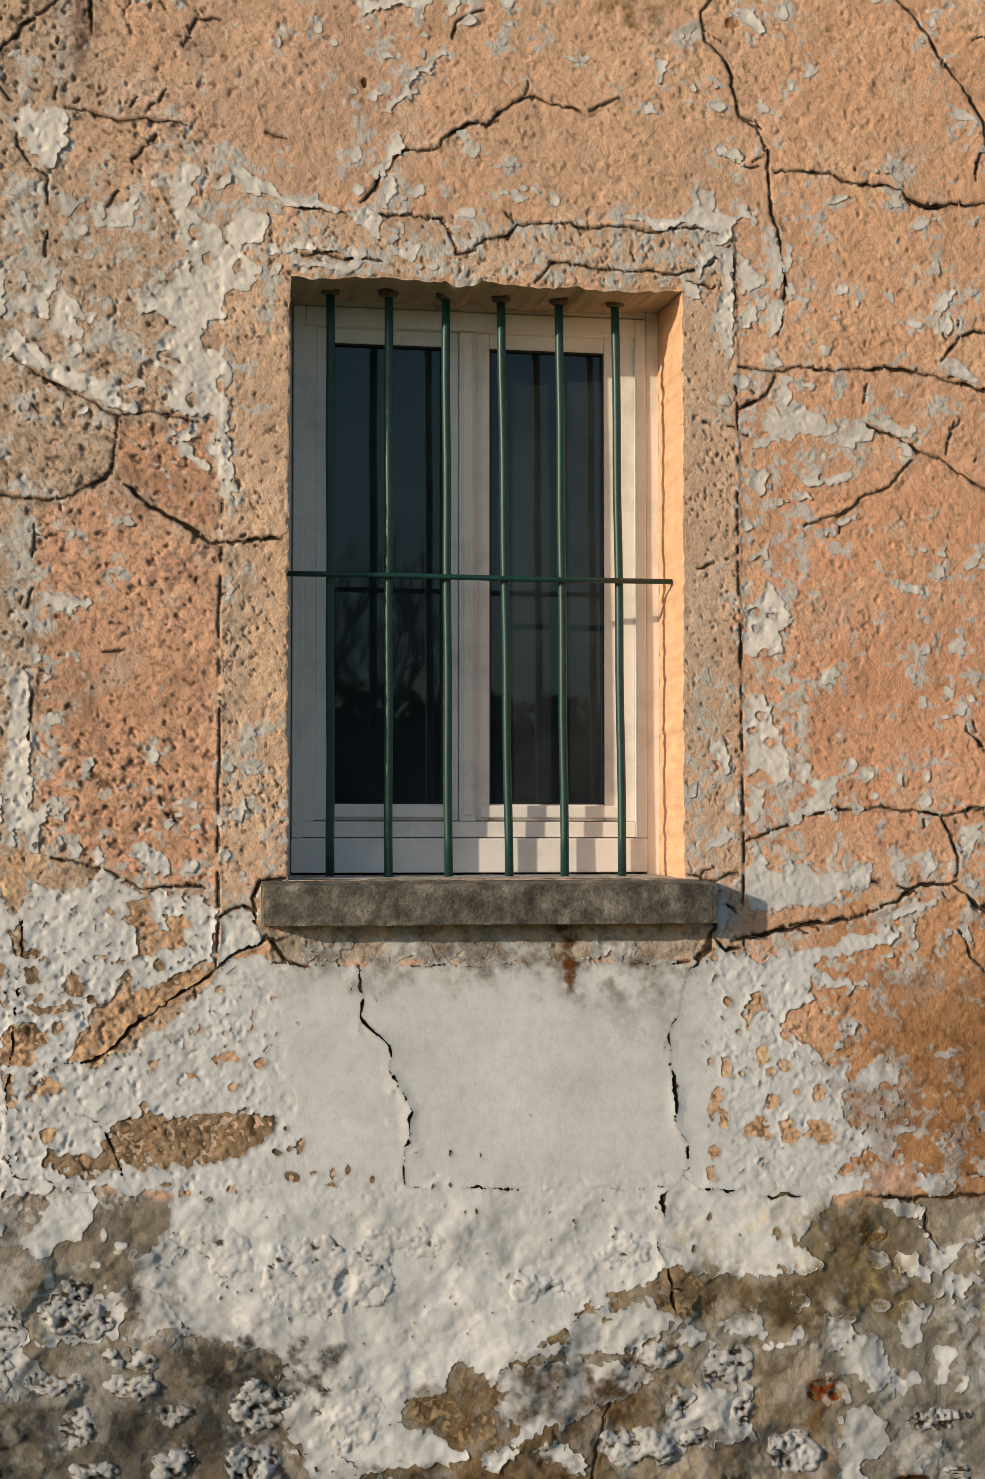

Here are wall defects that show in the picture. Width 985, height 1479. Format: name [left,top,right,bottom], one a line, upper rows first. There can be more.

peeling [0,266,146,414]
crack [0,0,187,207]
peeling [136,133,476,500]
crack [268,74,736,320]
peeling [624,186,916,457]
crack [0,355,432,1189]
crack [630,0,985,1315]
peeling [0,645,985,1479]
corrosion [556,925,576,991]
leakage [180,1336,347,1406]
leakage [516,1363,646,1422]
leakage [740,1212,908,1329]